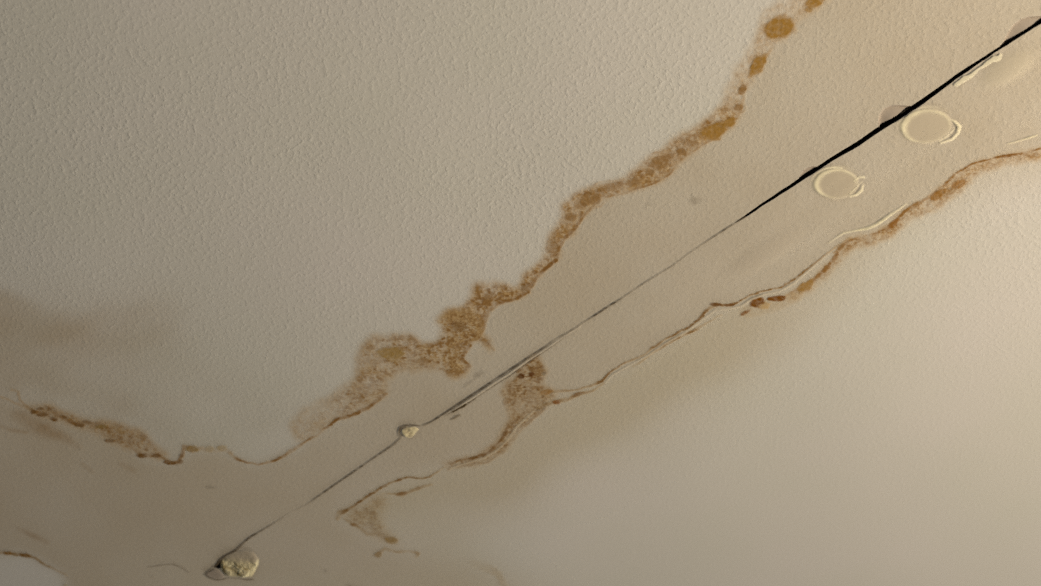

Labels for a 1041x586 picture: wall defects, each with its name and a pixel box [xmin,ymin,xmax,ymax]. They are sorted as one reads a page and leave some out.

leakage [765,18,794,38]
leakage [684,106,736,144]
crack [705,19,1041,243]
leakage [626,138,683,190]
leakage [931,174,965,203]
leakage [872,202,922,240]
leakage [799,262,831,291]
leakage [750,287,785,307]
leakage [378,285,530,382]
crack [426,266,672,424]
crack [313,435,402,500]
crack [219,524,272,560]